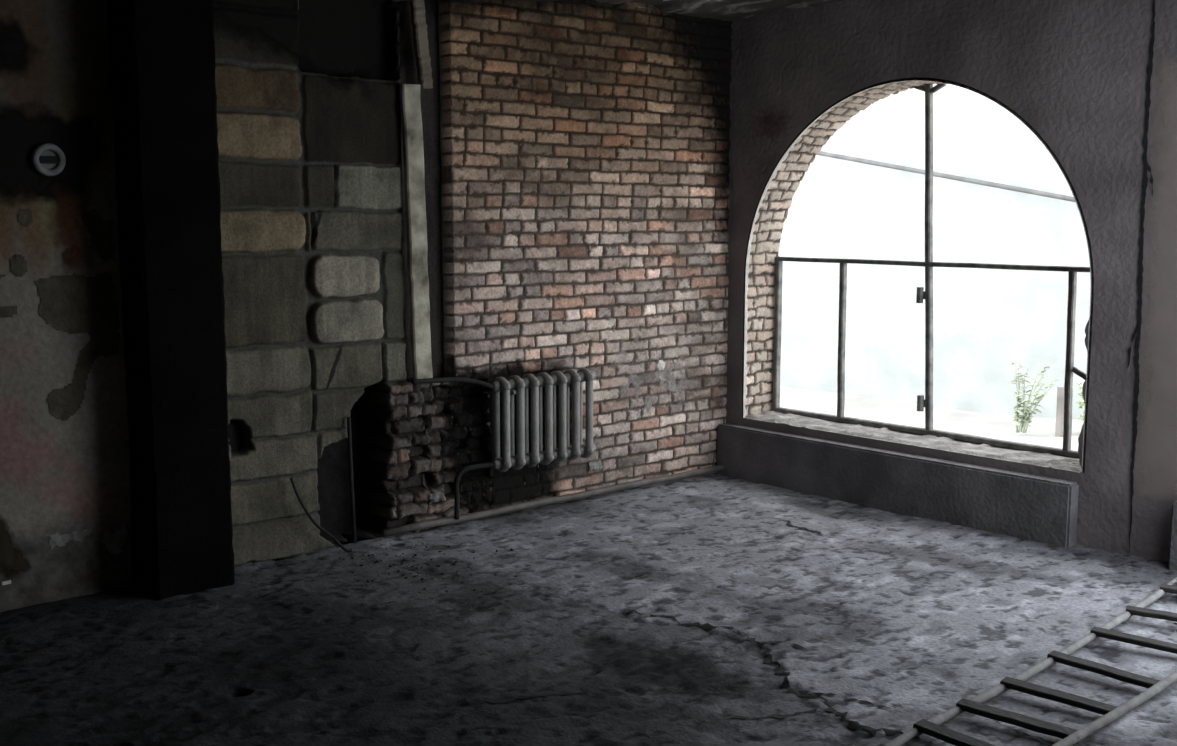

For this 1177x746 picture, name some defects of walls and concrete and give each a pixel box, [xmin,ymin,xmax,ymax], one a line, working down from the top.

peeling [0,248,120,421]
crack [988,719,1054,745]